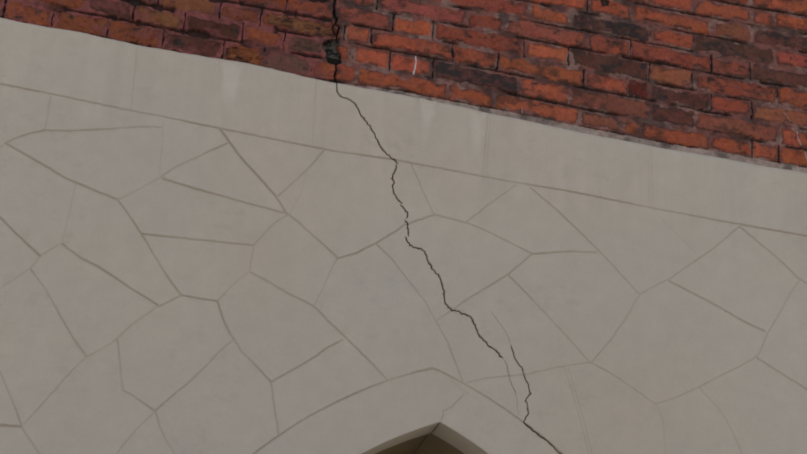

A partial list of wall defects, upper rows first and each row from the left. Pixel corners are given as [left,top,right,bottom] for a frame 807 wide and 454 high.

crack [334,64,560,454]